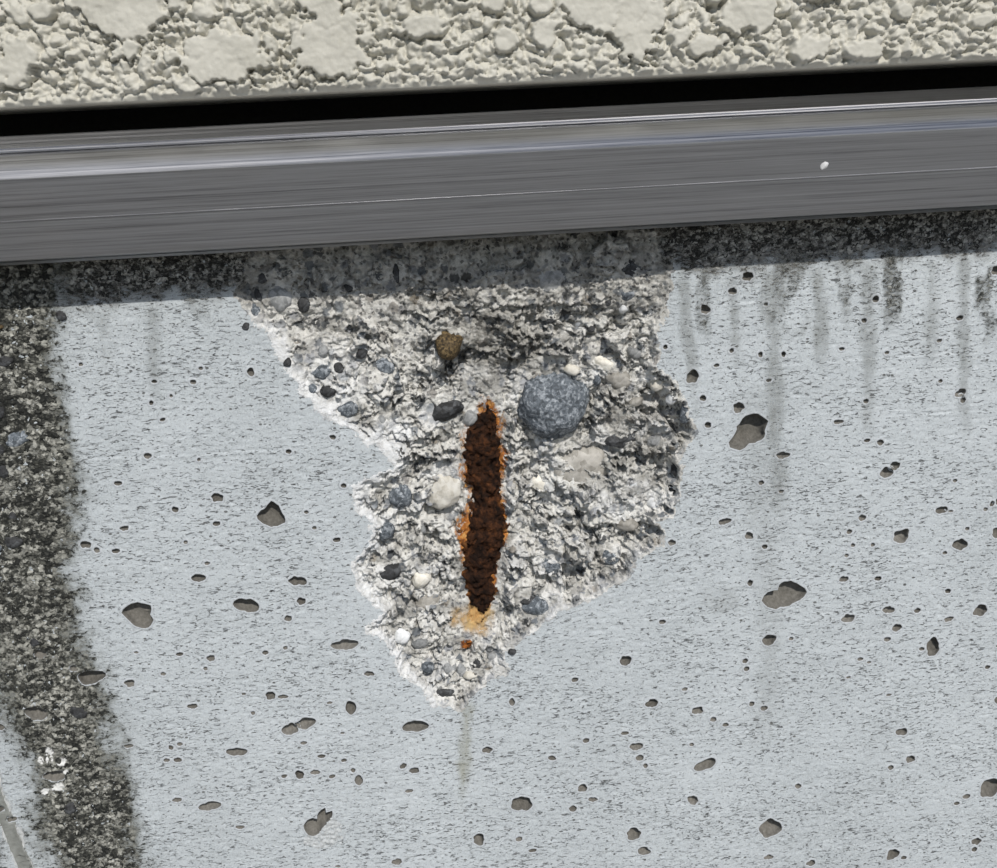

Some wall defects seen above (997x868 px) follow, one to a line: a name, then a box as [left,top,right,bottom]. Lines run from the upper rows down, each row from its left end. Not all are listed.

water stain [696,268,712,343]
water stain [883,247,907,330]
water stain [974,267,997,335]
water stain [0,262,157,868]
spalling [233,228,699,713]
corrosion [452,397,510,649]